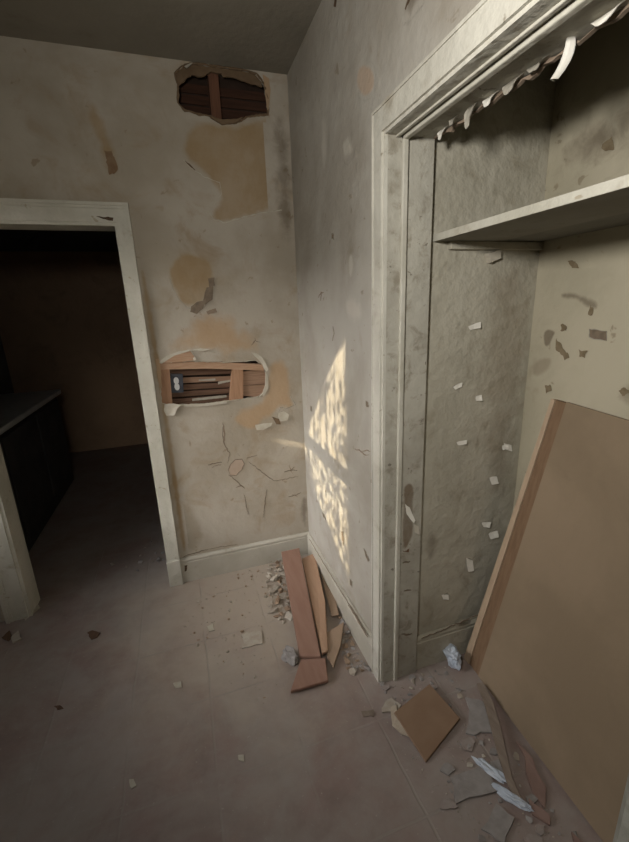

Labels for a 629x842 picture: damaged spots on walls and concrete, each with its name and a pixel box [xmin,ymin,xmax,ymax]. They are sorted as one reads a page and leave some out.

peeling [434,0,629,140]
peeling [165,249,217,315]
peeling [589,329,607,341]
spalling [156,348,296,433]
crack [210,425,300,516]
peeling [481,521,499,539]